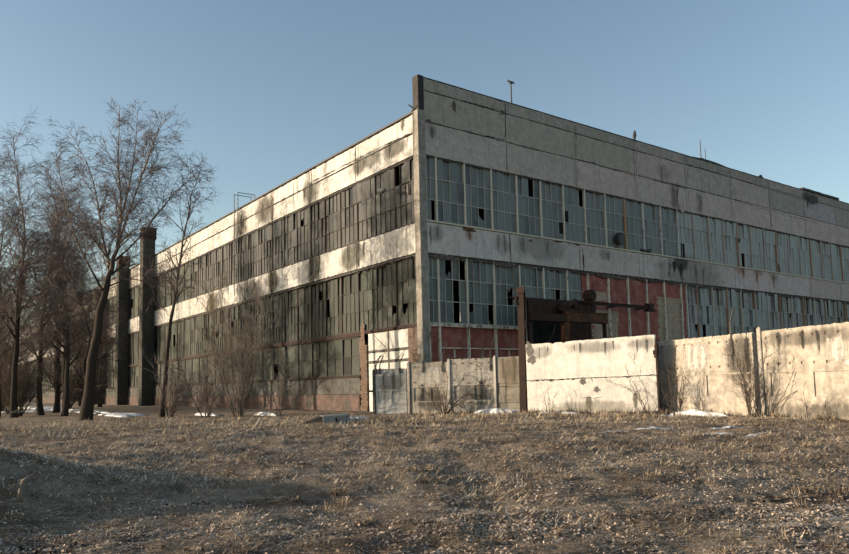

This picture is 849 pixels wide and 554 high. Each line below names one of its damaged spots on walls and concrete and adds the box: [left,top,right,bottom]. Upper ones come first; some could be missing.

leakage [354,140,403,175]
leakage [256,196,274,222]
leakage [235,213,246,236]
leakage [307,253,320,281]
leakage [343,240,365,271]